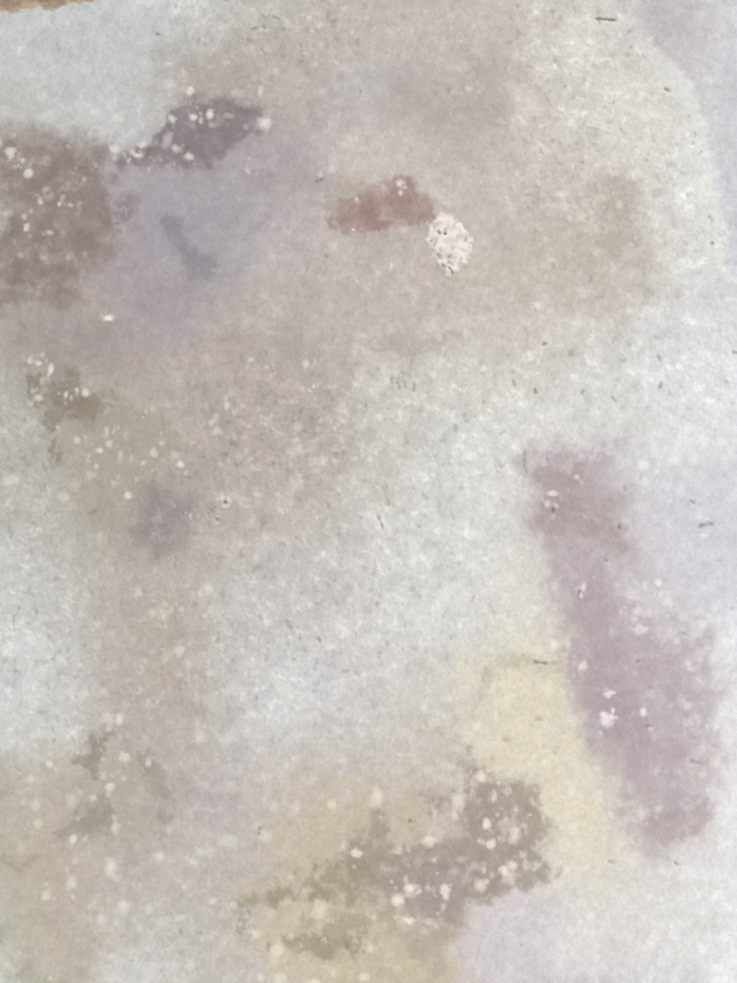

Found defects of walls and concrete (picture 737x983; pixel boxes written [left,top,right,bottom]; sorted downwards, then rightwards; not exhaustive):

spalling [0,0,100,18]
damp [0,21,337,381]
rust [311,162,456,252]
damp [424,209,475,280]
damp [0,464,265,979]
damp [212,404,737,983]